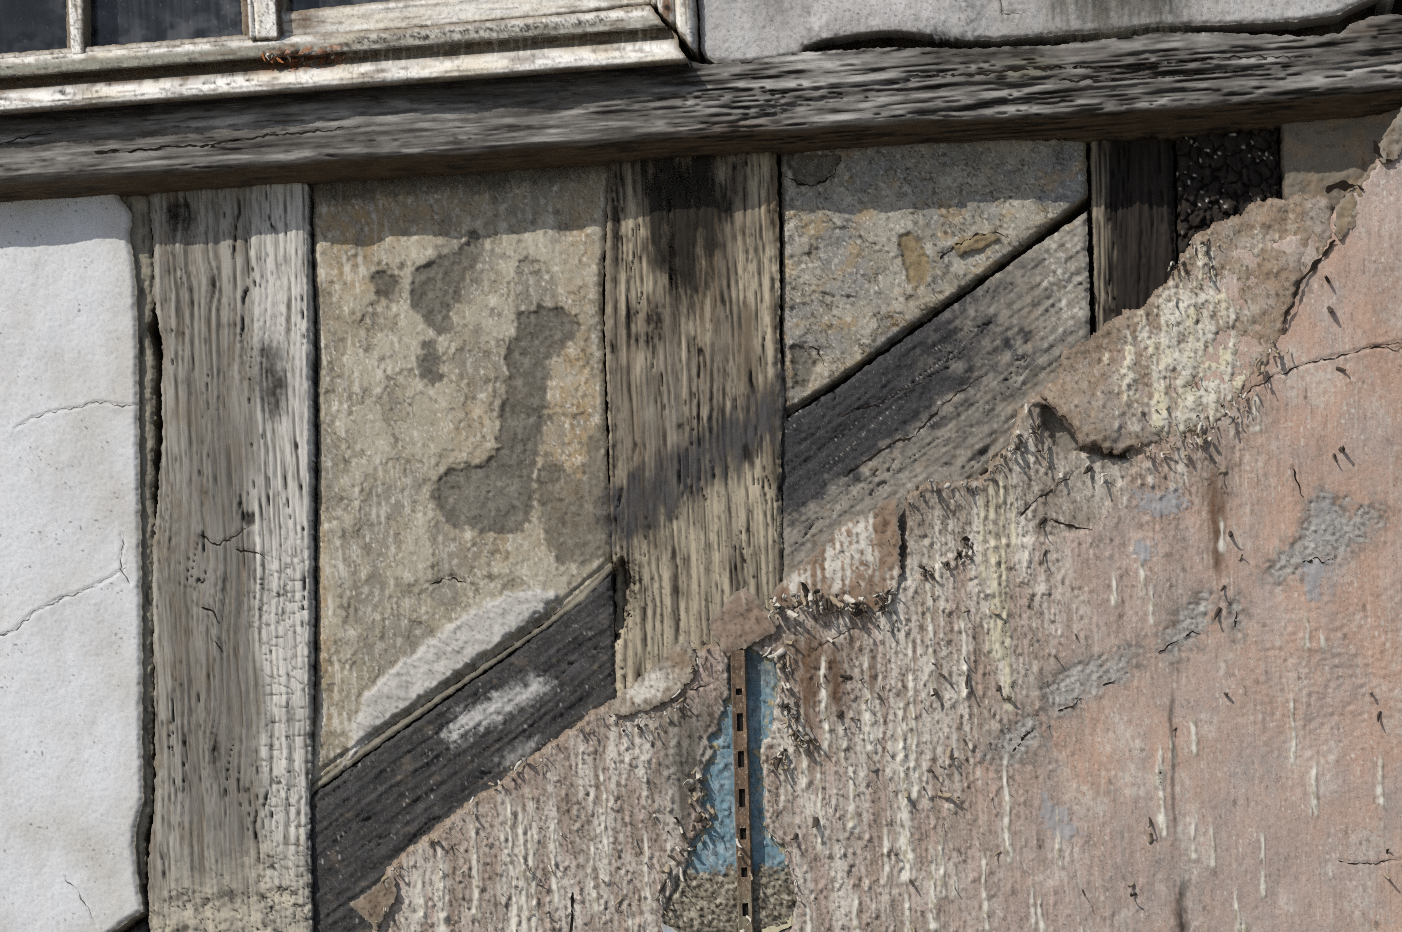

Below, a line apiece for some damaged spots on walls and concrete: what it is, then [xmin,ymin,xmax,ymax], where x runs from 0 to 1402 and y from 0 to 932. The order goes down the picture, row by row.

peeling [1168,238,1220,277]
crack [1282,240,1336,330]
crack [15,401,136,428]
peeling [1126,336,1289,458]
crack [1239,342,1402,398]
crack [0,539,130,635]
peeling [635,581,897,932]